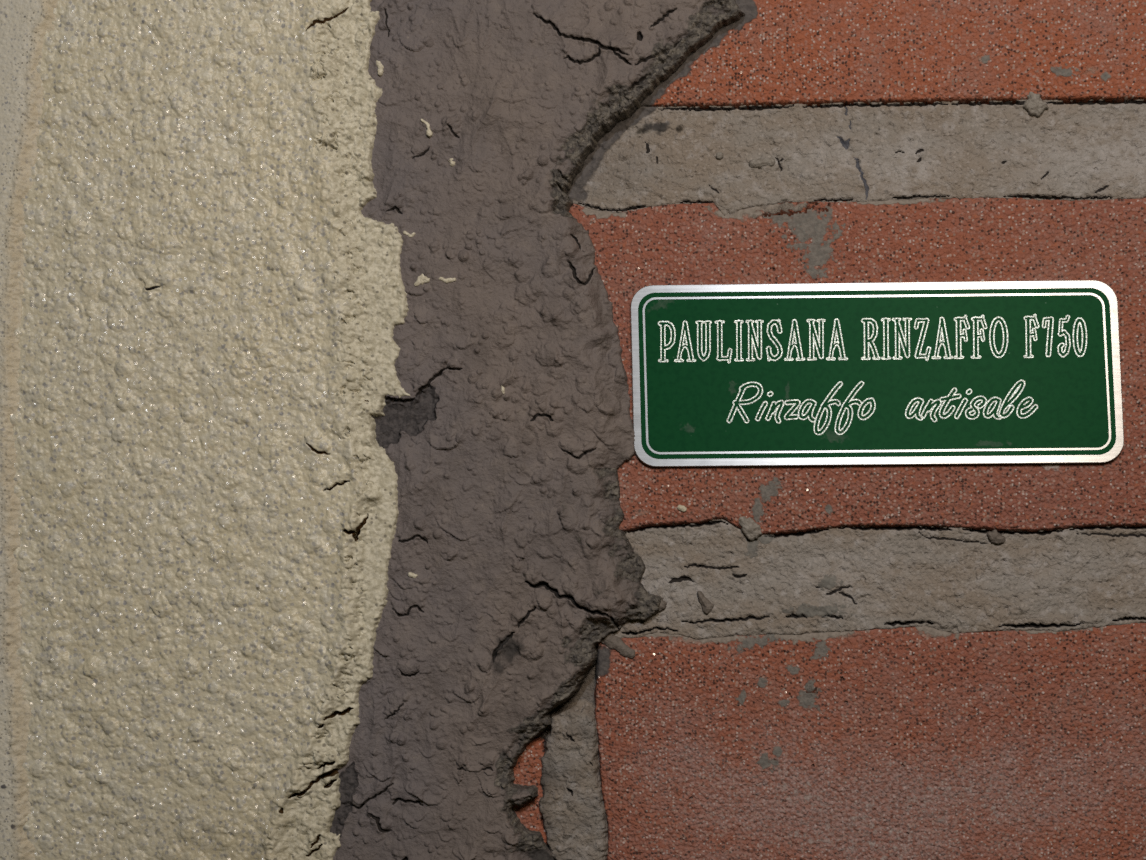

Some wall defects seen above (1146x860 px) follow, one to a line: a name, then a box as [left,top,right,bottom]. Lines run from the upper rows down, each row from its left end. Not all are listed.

crack [534,6,704,88]
spalling [549,0,745,219]
crack [658,100,1146,203]
spalling [371,385,439,448]
crack [343,514,369,541]
crack [626,520,1146,544]
crack [668,563,747,583]
crack [492,581,857,662]
crack [998,621,1084,629]
spalling [494,468,661,852]
crack [318,707,354,728]
crack [279,761,339,814]